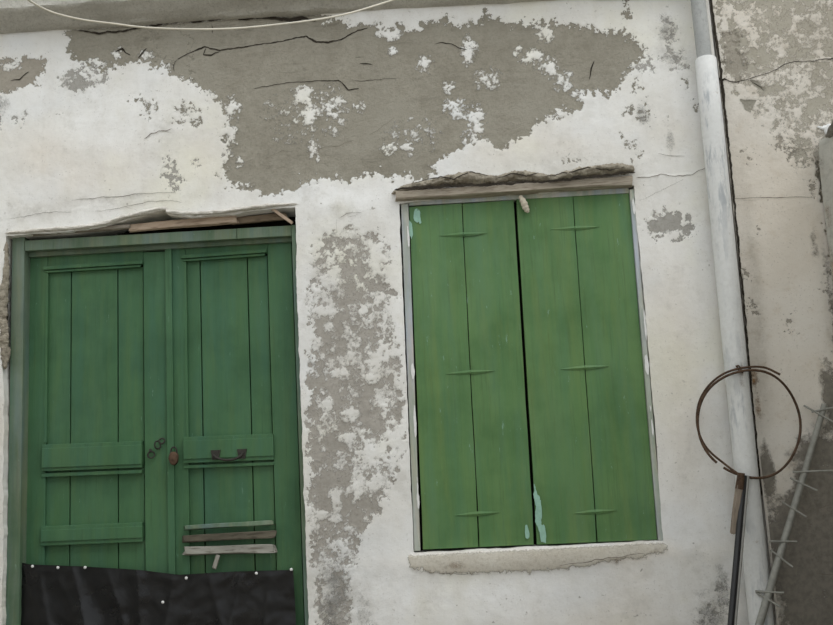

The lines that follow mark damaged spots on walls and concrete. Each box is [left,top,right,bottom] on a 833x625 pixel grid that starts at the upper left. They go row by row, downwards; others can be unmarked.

crack [79,16,367,69]
crack [254,63,395,91]
peeling [661,16,690,87]
peeling [713,0,833,203]
crack [77,192,182,210]
peeling [0,0,655,369]
peeling [644,206,695,242]
crack [710,0,833,495]
peeling [304,224,417,625]